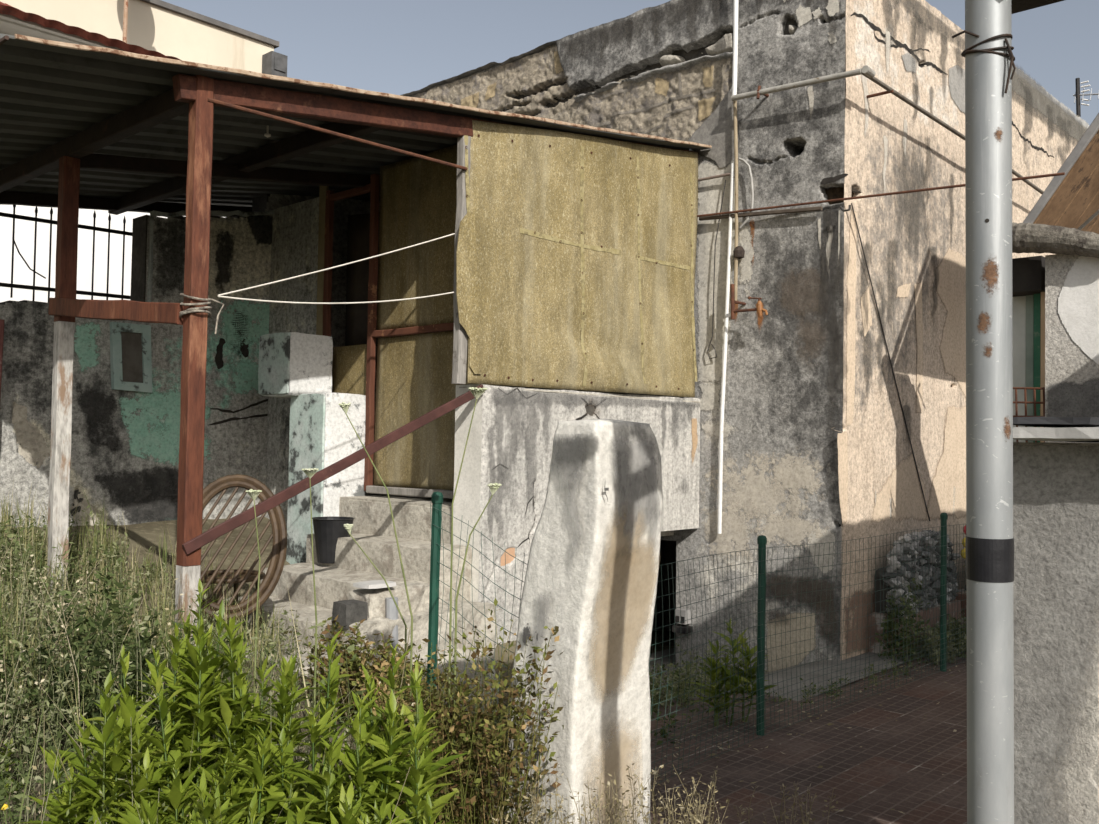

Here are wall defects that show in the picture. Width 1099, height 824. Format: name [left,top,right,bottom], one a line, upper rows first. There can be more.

peeling [795,0,839,27]
crack [823,12,948,75]
spalling [412,46,733,141]
water stain [247,215,273,245]
water stain [215,231,233,296]
rust [982,259,999,293]
rust [977,312,990,333]
water stain [76,383,119,453]
water stain [95,467,179,524]
crack [517,483,535,548]
water stain [593,440,660,694]
water stain [594,727,638,824]